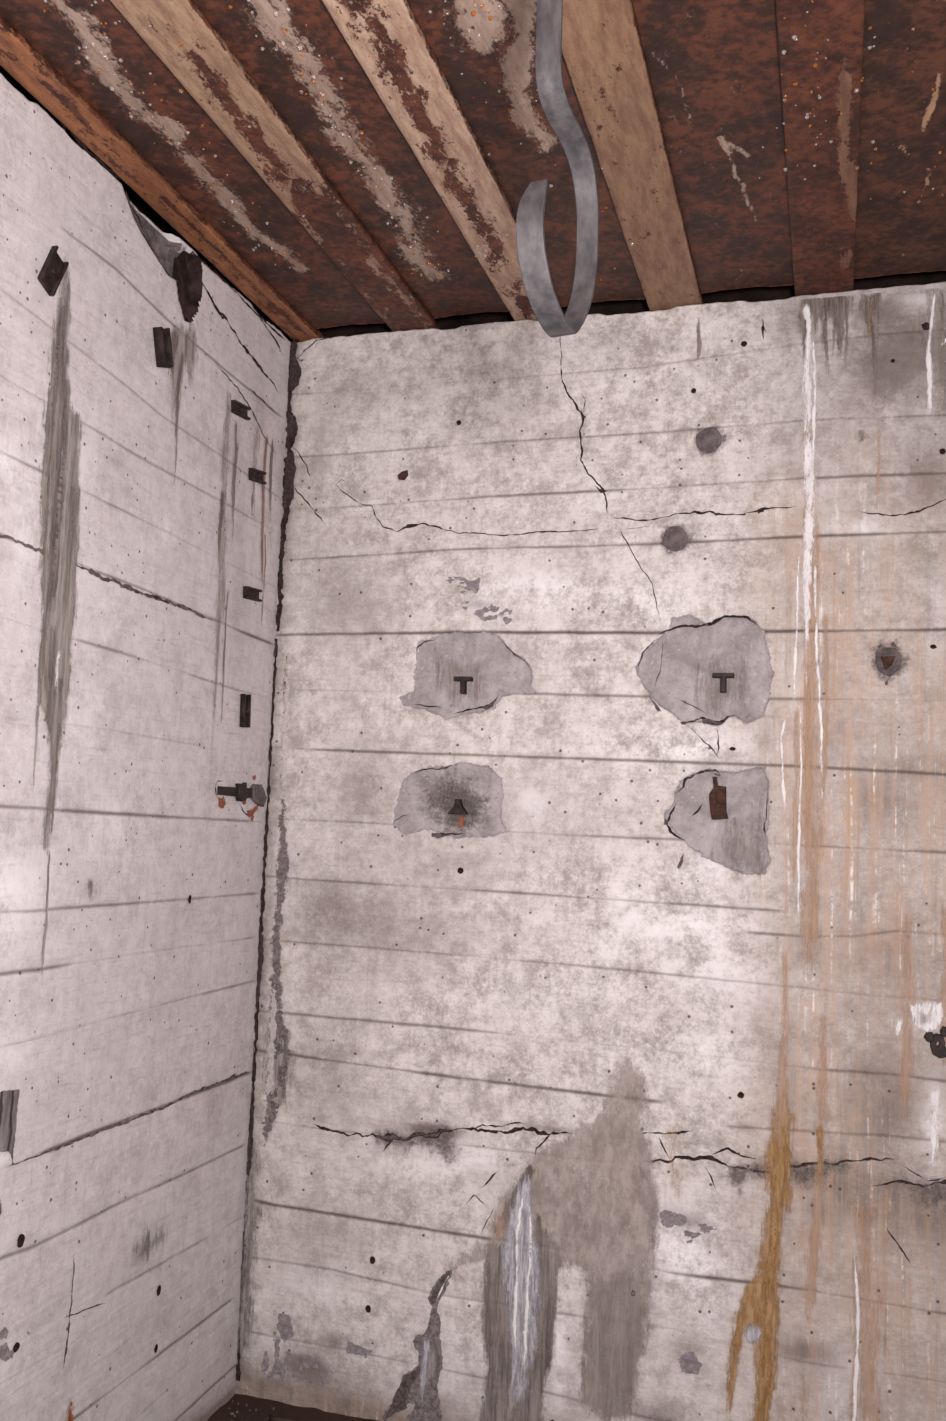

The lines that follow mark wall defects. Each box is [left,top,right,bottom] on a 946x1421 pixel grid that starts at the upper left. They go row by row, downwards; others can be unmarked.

crack [32,95,121,181]
damp [926,291,946,412]
damp [33,267,81,967]
crack [10,251,795,1381]
spalling [394,762,506,839]
spalling [399,576,535,720]
spalling [636,614,774,875]
damp [780,293,881,912]
peeling [381,1269,453,1421]
damp [459,1060,657,1421]
rust [726,1050,793,1421]
crack [643,1130,946,1206]